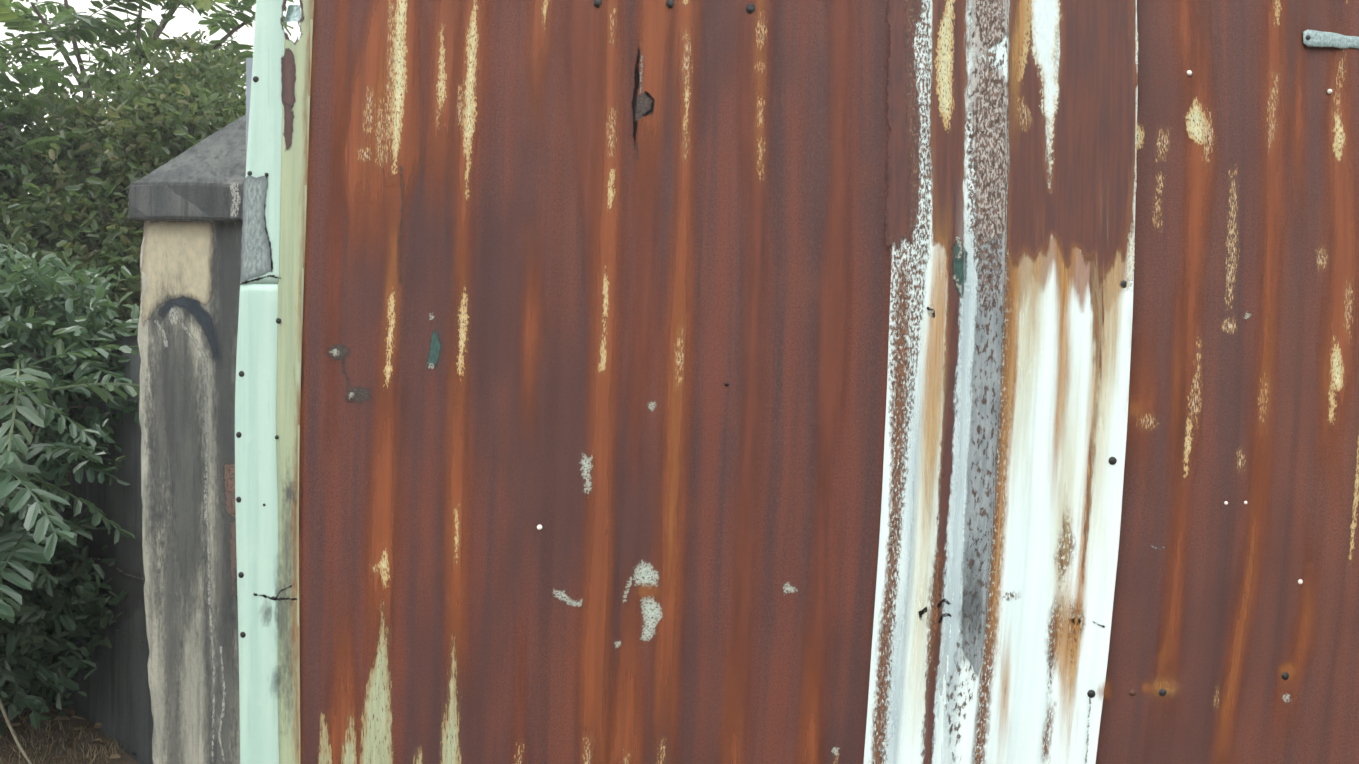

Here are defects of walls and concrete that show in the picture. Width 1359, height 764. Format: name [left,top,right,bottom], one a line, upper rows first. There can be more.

damp [84,181,242,764]
corrosion [326,642,358,764]
corrosion [341,0,486,647]
peeling [552,589,583,608]
corrosion [571,0,699,764]
crack [632,49,655,160]
peeling [623,559,664,641]
corrosion [735,0,772,667]
corrosion [872,0,1139,764]
corrosion [1128,0,1214,434]
corrosion [1213,0,1305,745]
corrosion [1322,56,1357,441]